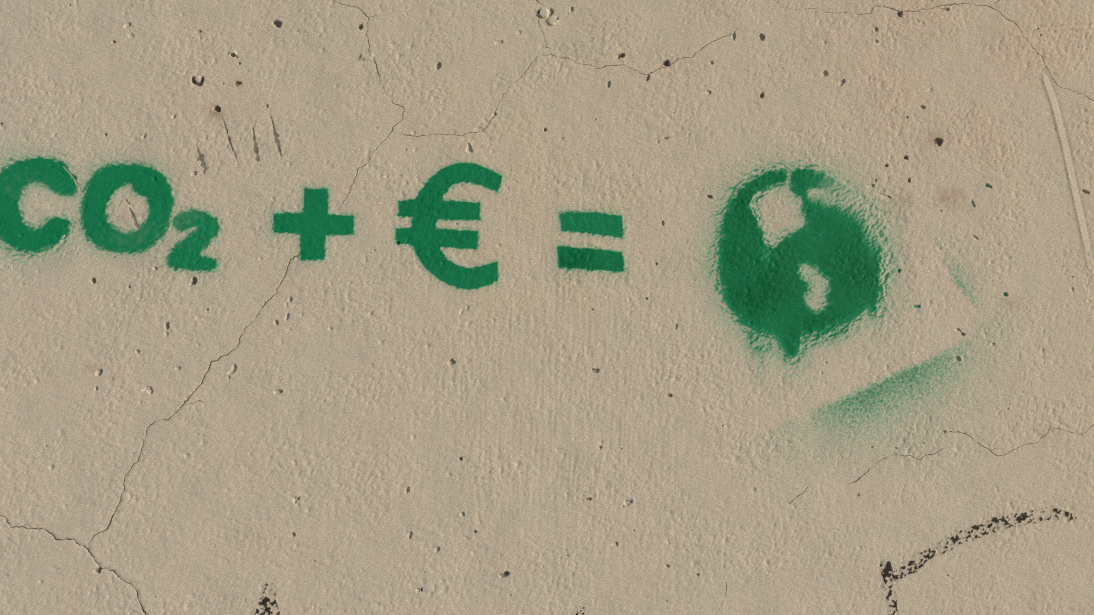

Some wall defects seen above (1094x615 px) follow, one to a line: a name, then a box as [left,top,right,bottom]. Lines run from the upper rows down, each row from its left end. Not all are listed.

crack [334,0,737,207]
crack [3,253,302,615]